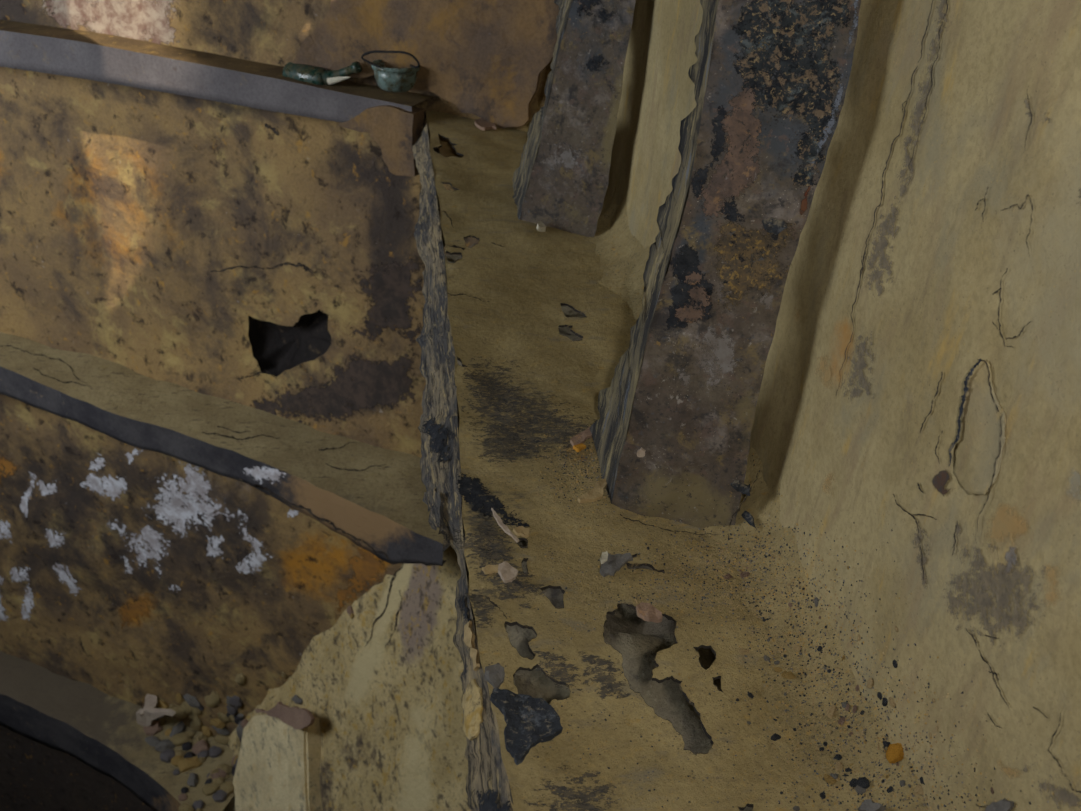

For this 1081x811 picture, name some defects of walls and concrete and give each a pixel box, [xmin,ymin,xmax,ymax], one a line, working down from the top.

crack [836,0,948,395]
crack [976,187,1033,347]
spalling [248,310,331,377]
crack [920,373,943,464]
water stain [19,472,57,518]
water stain [81,454,127,501]
water stain [107,463,274,579]
water stain [244,466,286,484]
crack [893,483,958,581]
water stain [0,567,34,622]
water stain [52,563,82,596]
crack [966,629,1081,793]